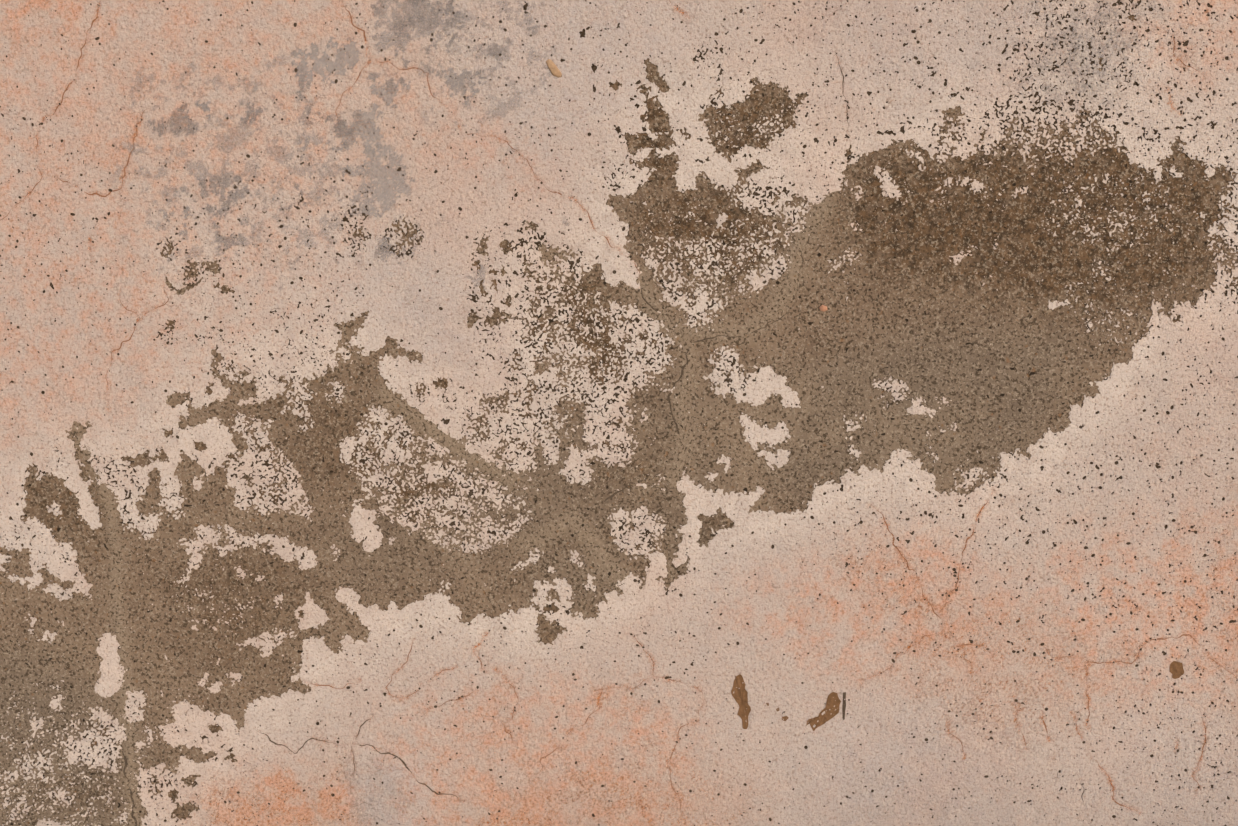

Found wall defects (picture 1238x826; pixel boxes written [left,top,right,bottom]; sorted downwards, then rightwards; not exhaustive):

peeling [644,58,671,93]
peeling [698,77,809,163]
peeling [938,106,965,141]
peeling [165,258,235,295]
peeling [467,261,507,303]
peeling [484,307,513,328]
peeling [121,448,170,468]
peeling [696,507,734,547]
spalling [1170,661,1184,679]
spalling [731,674,751,729]
spalling [806,692,841,731]
peeling [168,788,201,820]